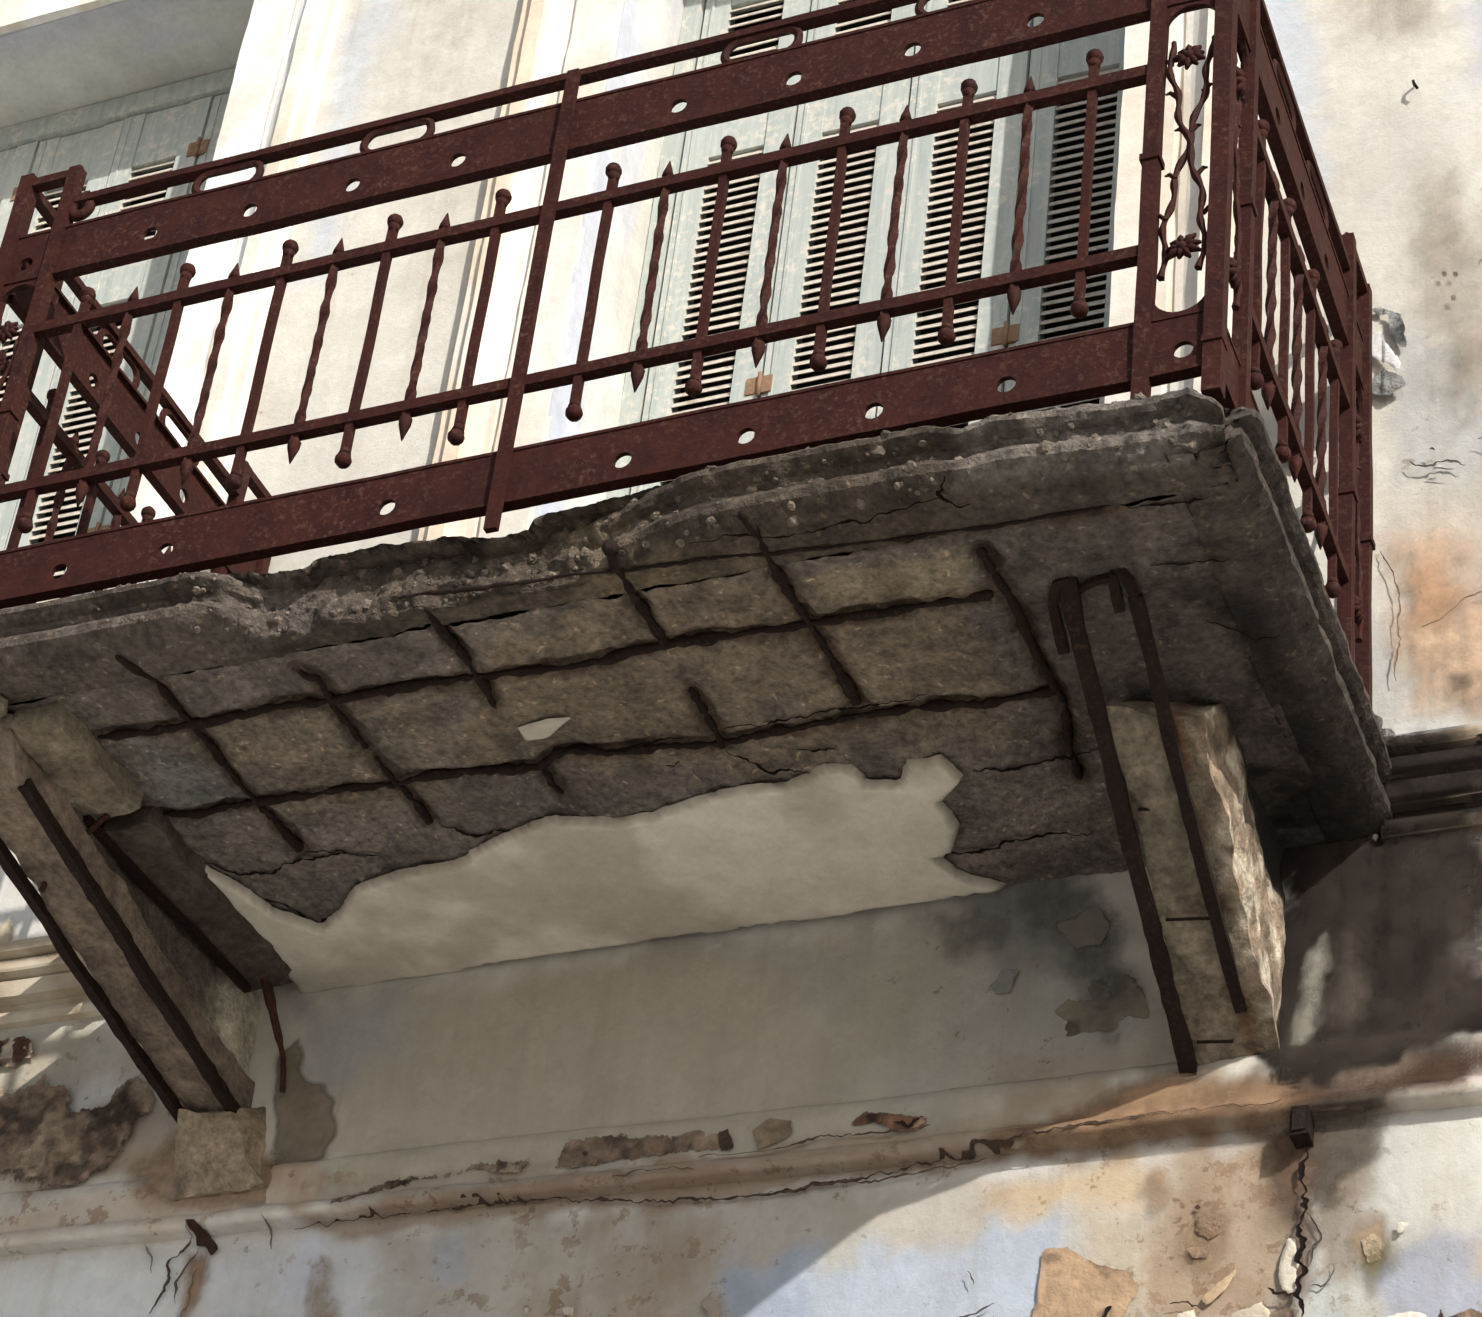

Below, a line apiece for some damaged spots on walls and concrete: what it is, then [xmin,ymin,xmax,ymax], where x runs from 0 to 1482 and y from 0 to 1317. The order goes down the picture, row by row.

peeling [1372,307,1407,396]
crack [1380,551,1482,681]
spalling [0,430,1325,923]
water stain [1256,727,1482,1102]
peeling [1055,975,1149,1037]
crack [1197,1038,1234,1046]
spalling [0,1073,155,1191]
flaking render [555,1129,734,1169]
crack [959,1271,994,1317]
flaking render [1032,1247,1138,1317]
peeling [1278,1238,1299,1294]
crack [1268,1144,1335,1317]